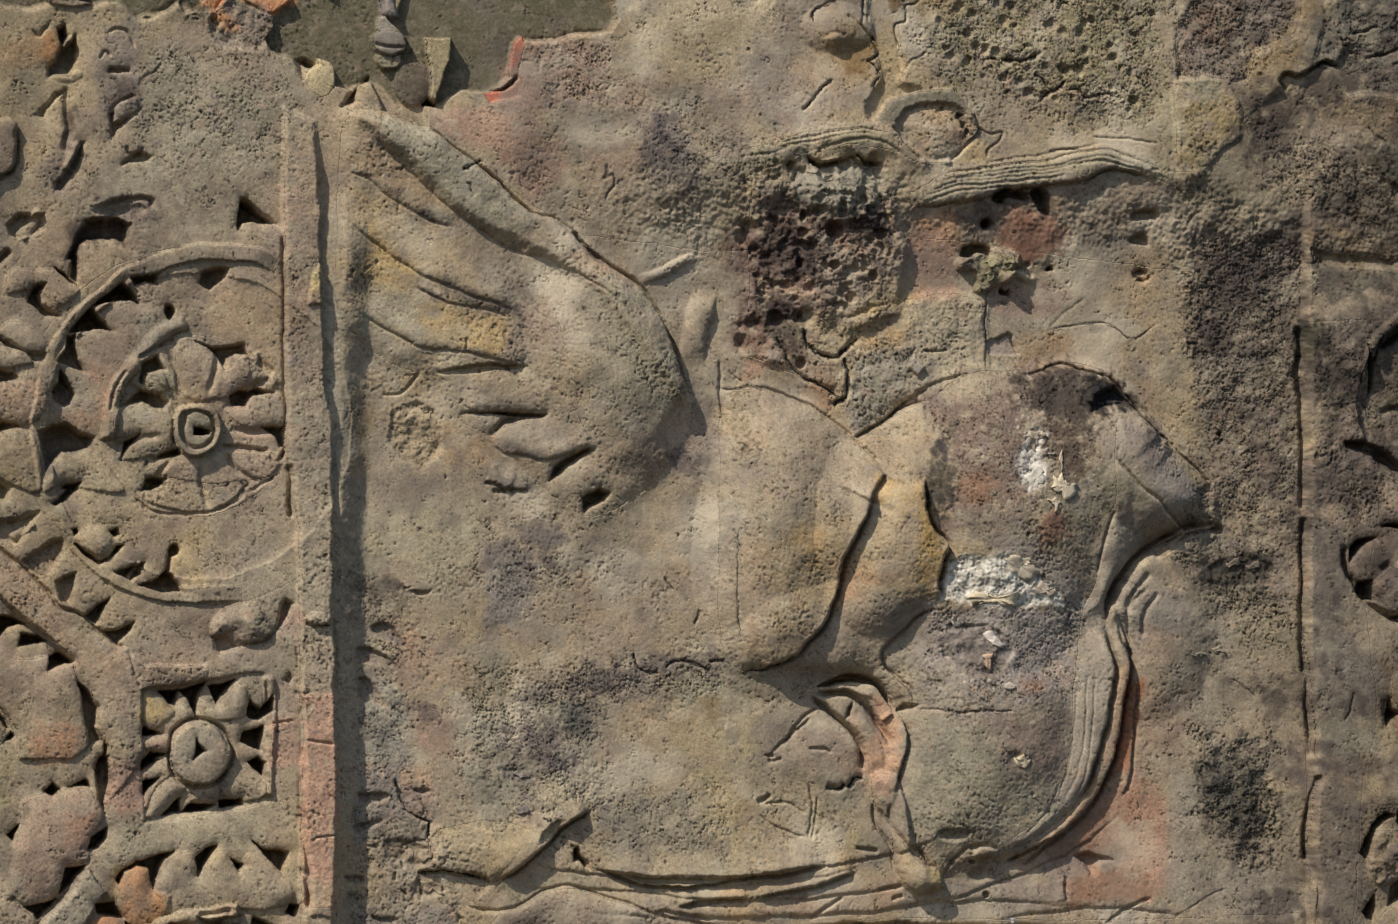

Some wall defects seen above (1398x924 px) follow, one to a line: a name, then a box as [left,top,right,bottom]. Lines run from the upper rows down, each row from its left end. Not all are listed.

spalling [793,161,885,218]
water stain [1041,421,1095,481]